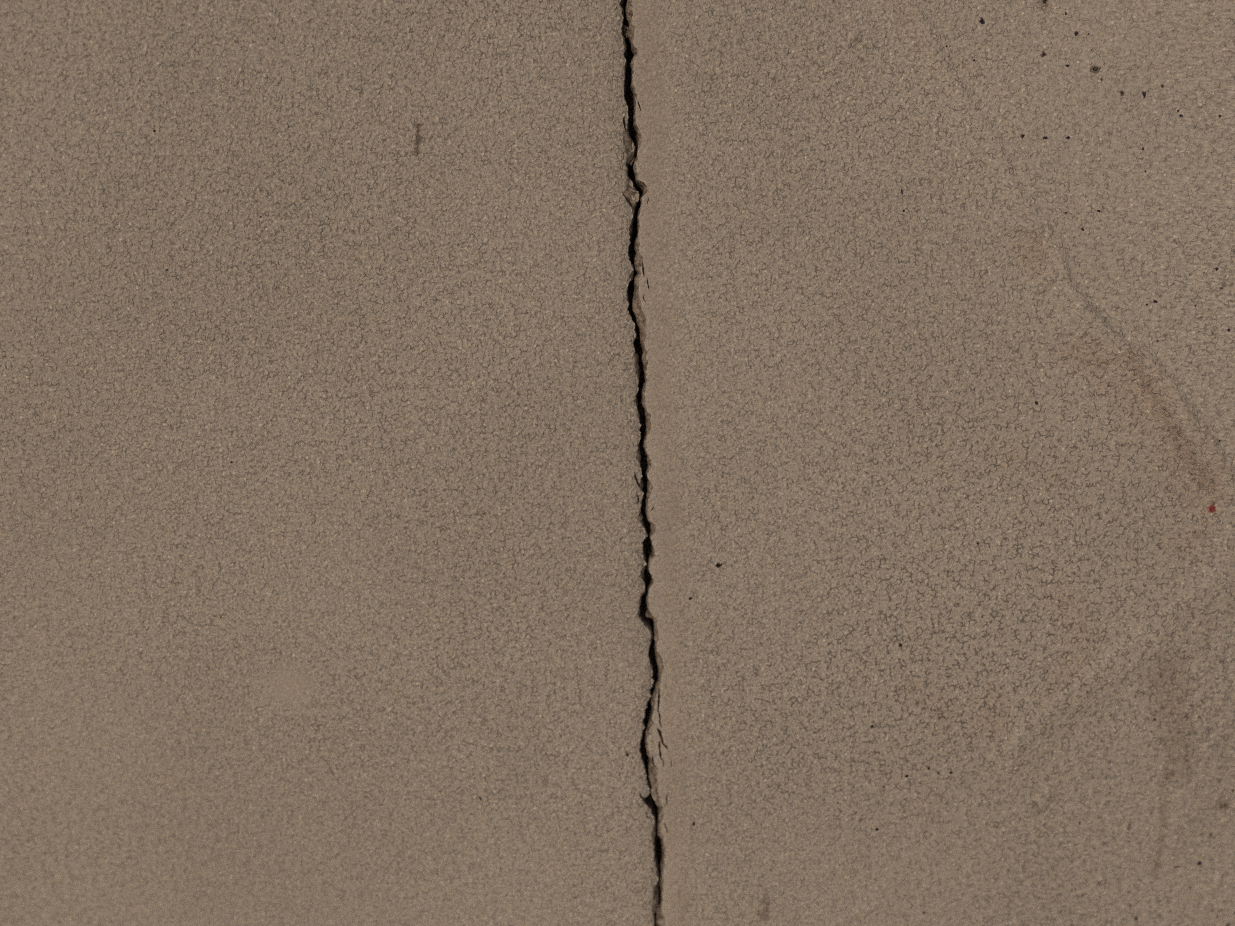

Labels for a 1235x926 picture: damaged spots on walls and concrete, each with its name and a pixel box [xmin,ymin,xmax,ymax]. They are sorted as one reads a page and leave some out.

crack [620,0,672,926]